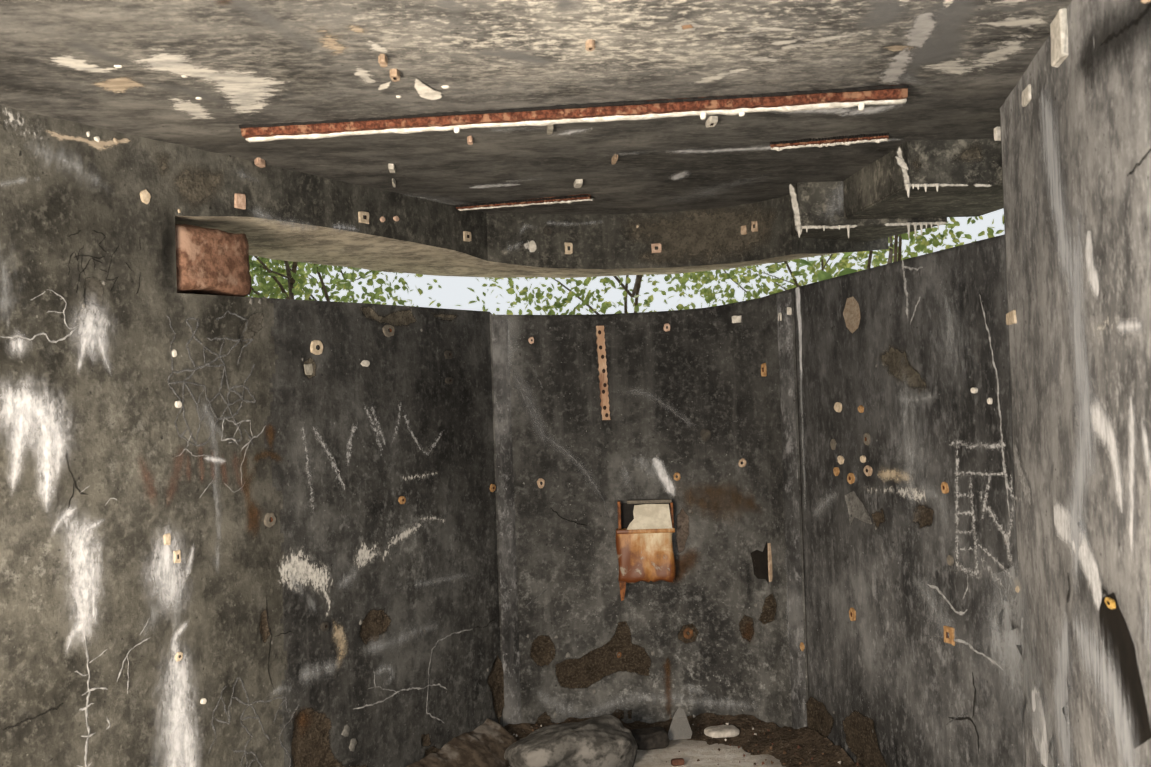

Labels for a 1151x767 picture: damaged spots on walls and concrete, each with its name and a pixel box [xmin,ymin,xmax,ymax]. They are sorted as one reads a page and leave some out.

rust [596,326,610,420]